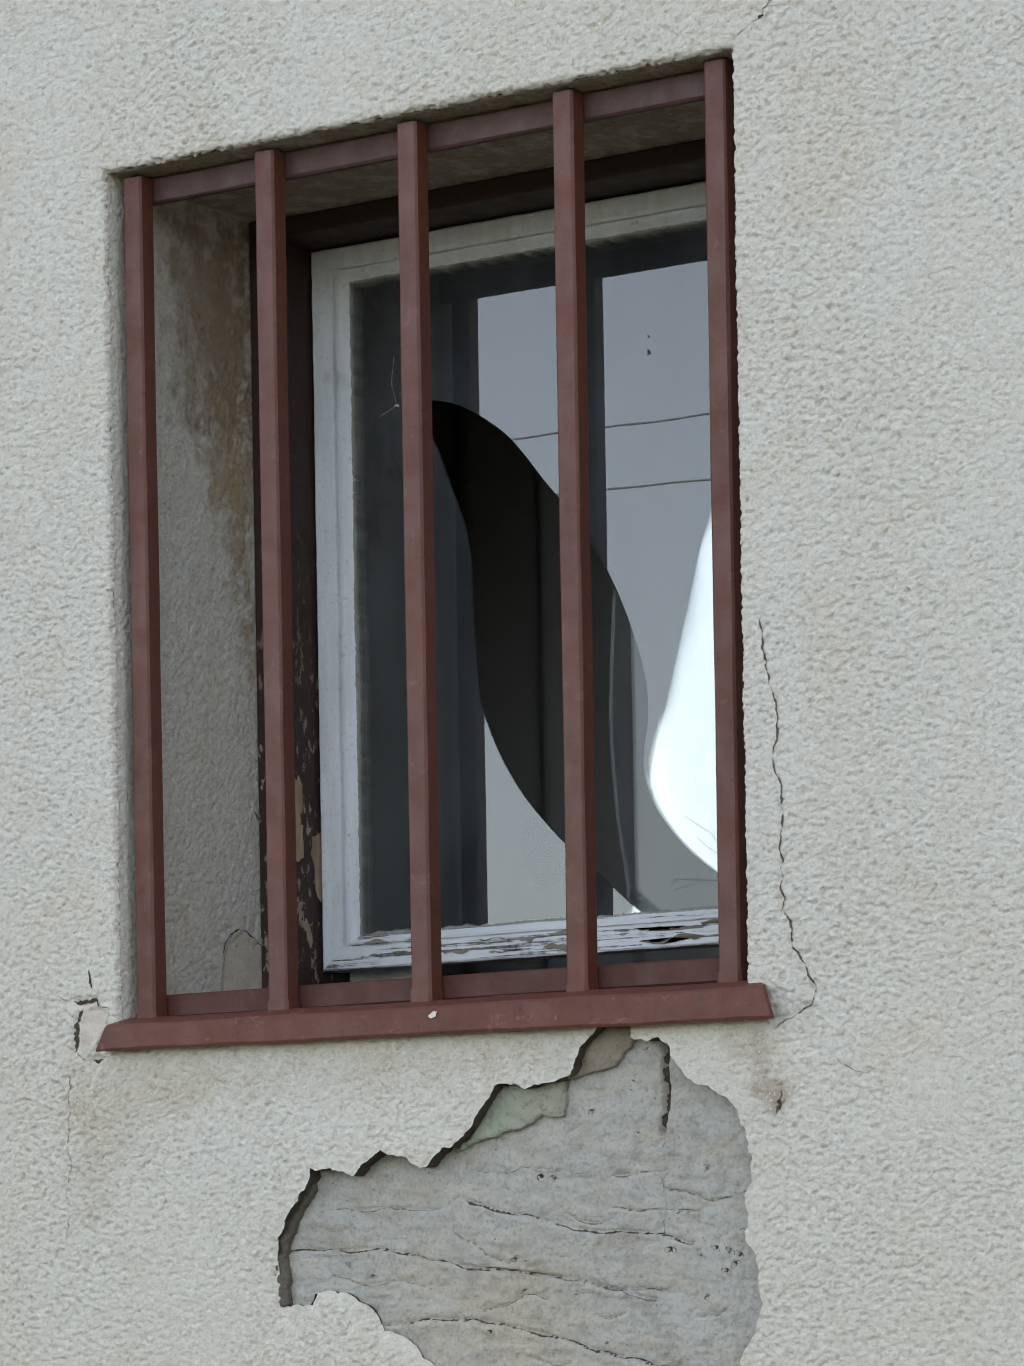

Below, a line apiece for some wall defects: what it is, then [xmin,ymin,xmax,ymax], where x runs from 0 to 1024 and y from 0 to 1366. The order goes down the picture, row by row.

crack [759,616,816,1028]
flaking render [80,1004,109,1053]
flaking render [274,1026,763,1366]